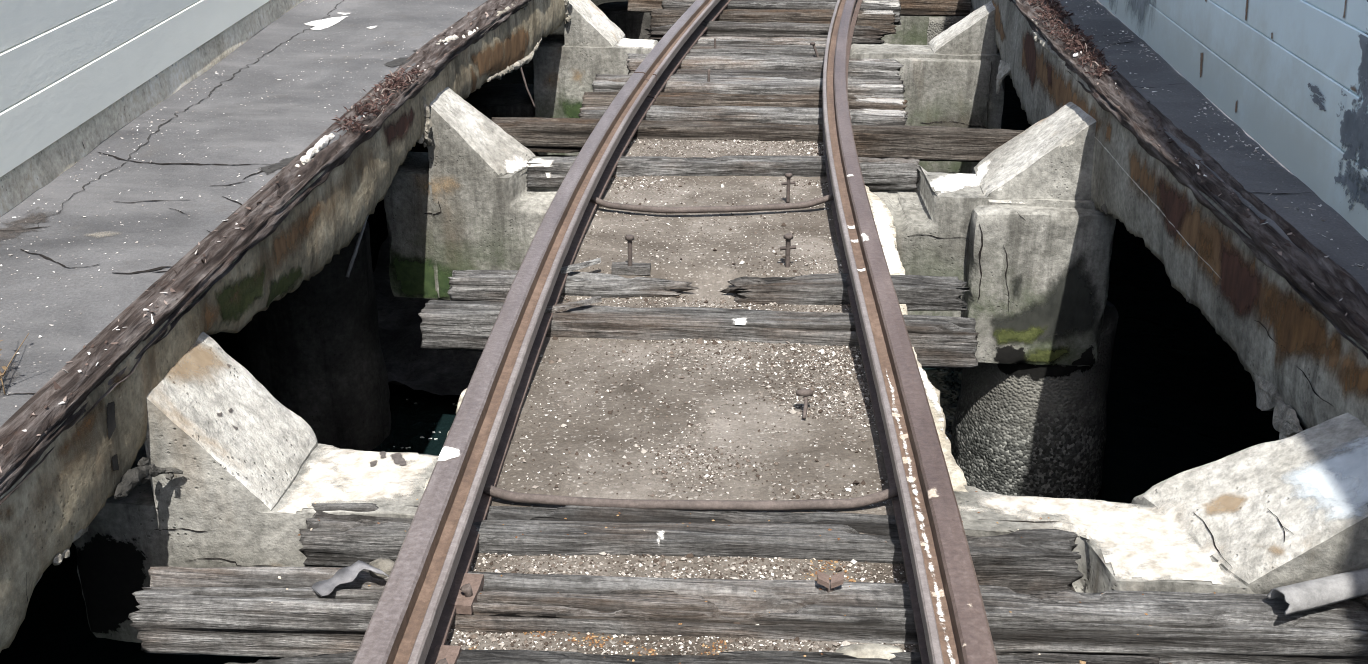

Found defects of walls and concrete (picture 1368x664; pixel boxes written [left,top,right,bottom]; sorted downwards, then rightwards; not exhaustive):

crack [1,0,344,274]
corrosion [992,0,1368,395]
peeling [1308,33,1368,210]
water stain [992,257,1098,381]
peeling [1255,375,1303,440]
crack [1194,513,1233,569]